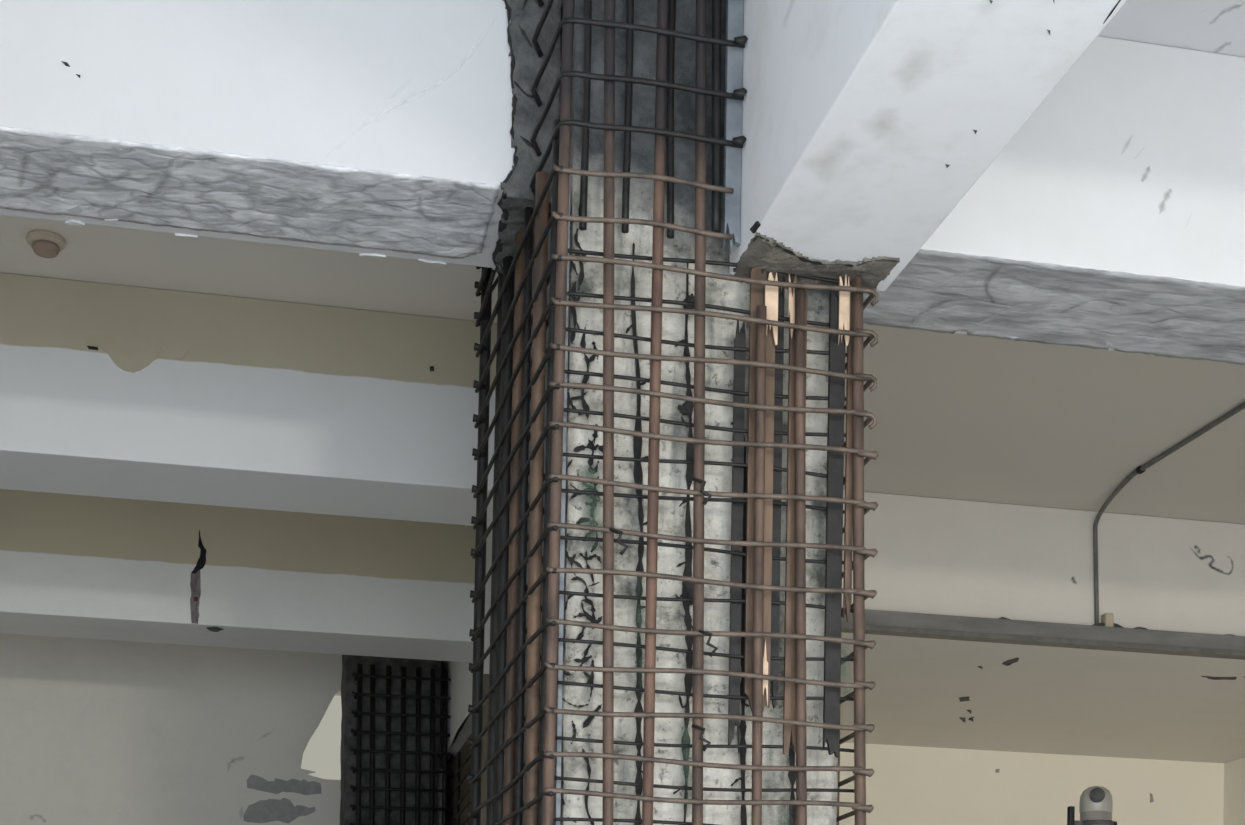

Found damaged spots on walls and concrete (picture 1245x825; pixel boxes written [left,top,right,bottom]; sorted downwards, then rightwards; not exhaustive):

peeling [243,775,322,823]
crack [560,204,603,825]
crack [626,243,650,825]
crack [673,263,694,822]
spalling [678,401,694,416]
spalling [682,581,693,605]
crack [730,422,750,825]
crack [788,737,796,825]